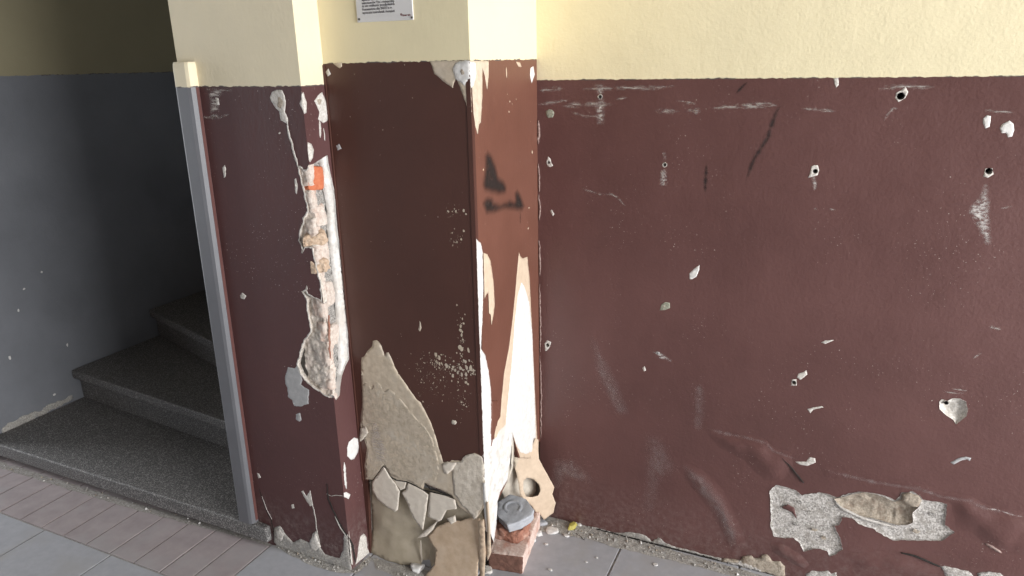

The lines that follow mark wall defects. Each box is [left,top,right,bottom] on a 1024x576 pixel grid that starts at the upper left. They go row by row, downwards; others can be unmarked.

peeling [983,115,1014,137]
flaking render [270,90,349,422]
peeling [476,239,495,502]
peeling [538,240,551,439]
flaking render [939,392,968,424]
flaking render [274,526,369,571]
peeling [372,467,457,530]
flaking render [769,485,954,556]